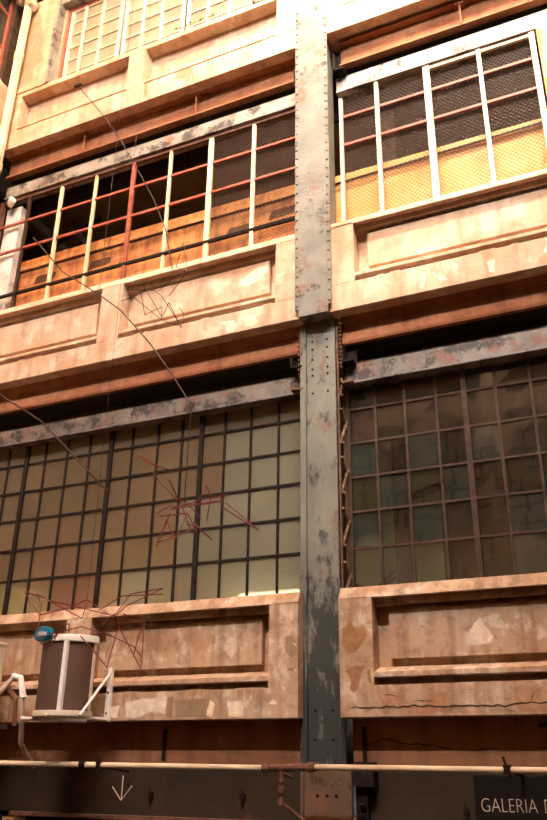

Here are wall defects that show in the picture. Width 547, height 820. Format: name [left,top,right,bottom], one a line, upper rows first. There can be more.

crack [352,688,547,711]